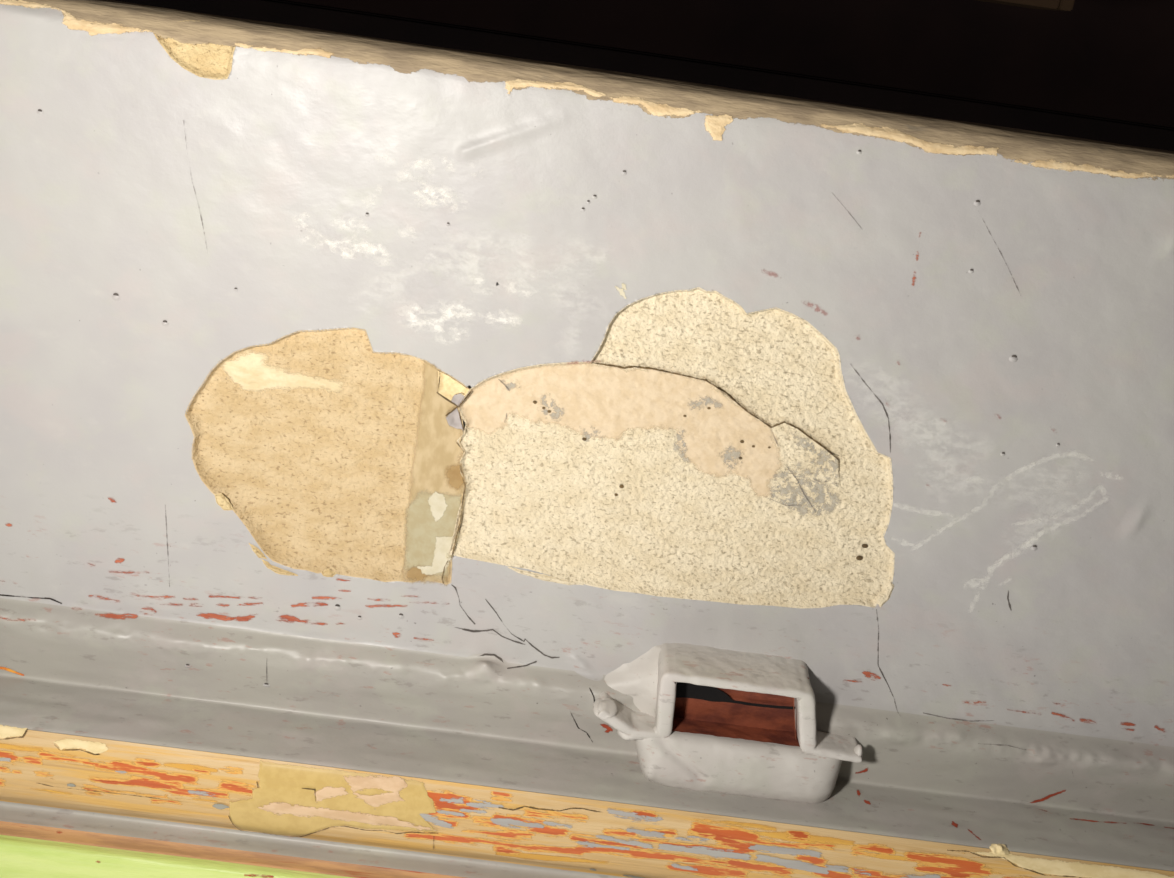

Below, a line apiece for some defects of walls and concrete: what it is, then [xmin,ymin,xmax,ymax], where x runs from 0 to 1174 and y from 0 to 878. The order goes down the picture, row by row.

peeling [0,0,1174,181]
peeling [185,284,895,609]
crack [452,585,559,669]
peeling [0,725,1174,878]